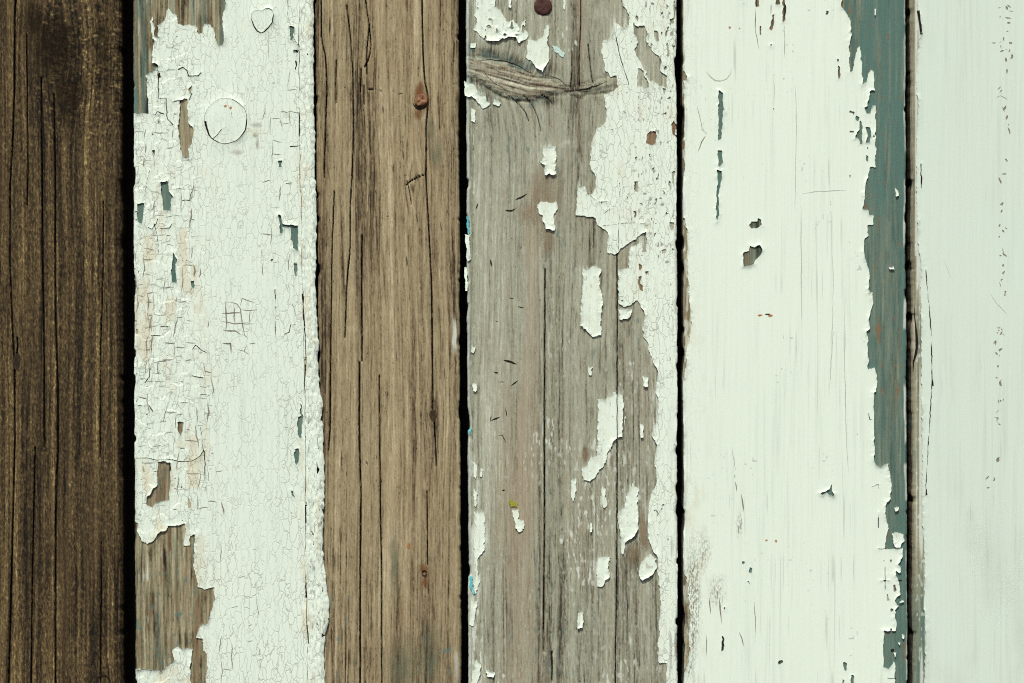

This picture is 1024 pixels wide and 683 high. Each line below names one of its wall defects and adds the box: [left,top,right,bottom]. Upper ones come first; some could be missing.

peeling [133,0,226,114]
peeling [470,0,565,72]
peeling [716,90,724,219]
crack [134,0,445,683]
peeling [580,266,603,337]
crack [588,171,643,374]
peeling [837,0,926,683]
peeling [146,461,171,507]
peeling [571,392,626,508]
crack [613,445,621,608]
peeling [596,483,639,587]
peeling [135,522,215,683]